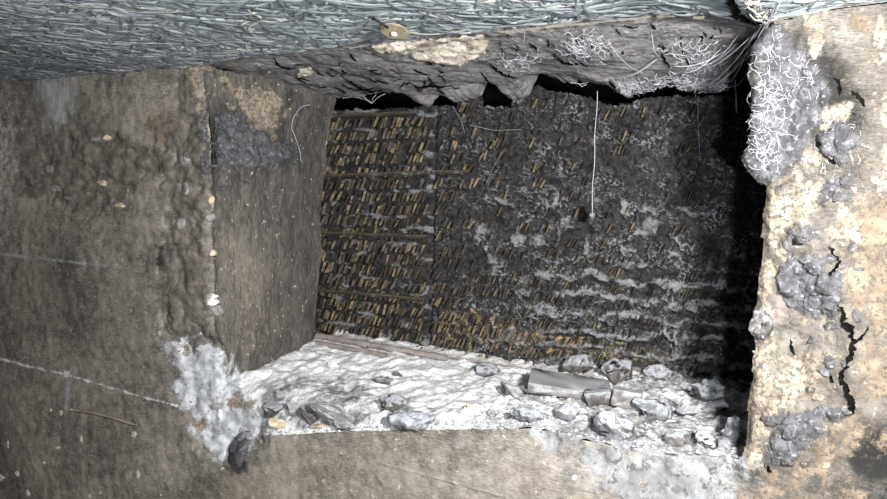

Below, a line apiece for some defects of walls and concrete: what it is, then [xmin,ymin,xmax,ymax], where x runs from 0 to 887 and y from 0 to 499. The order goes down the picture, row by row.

peeling [496,15,675,34]
spalling [348,34,488,66]
spalling [297,67,314,78]
spalling [334,92,458,111]
spalling [482,83,512,108]
spalling [533,59,751,107]
crack [829,245,841,276]
damp [836,199,887,401]
crack [830,304,869,414]
peeling [226,391,258,410]